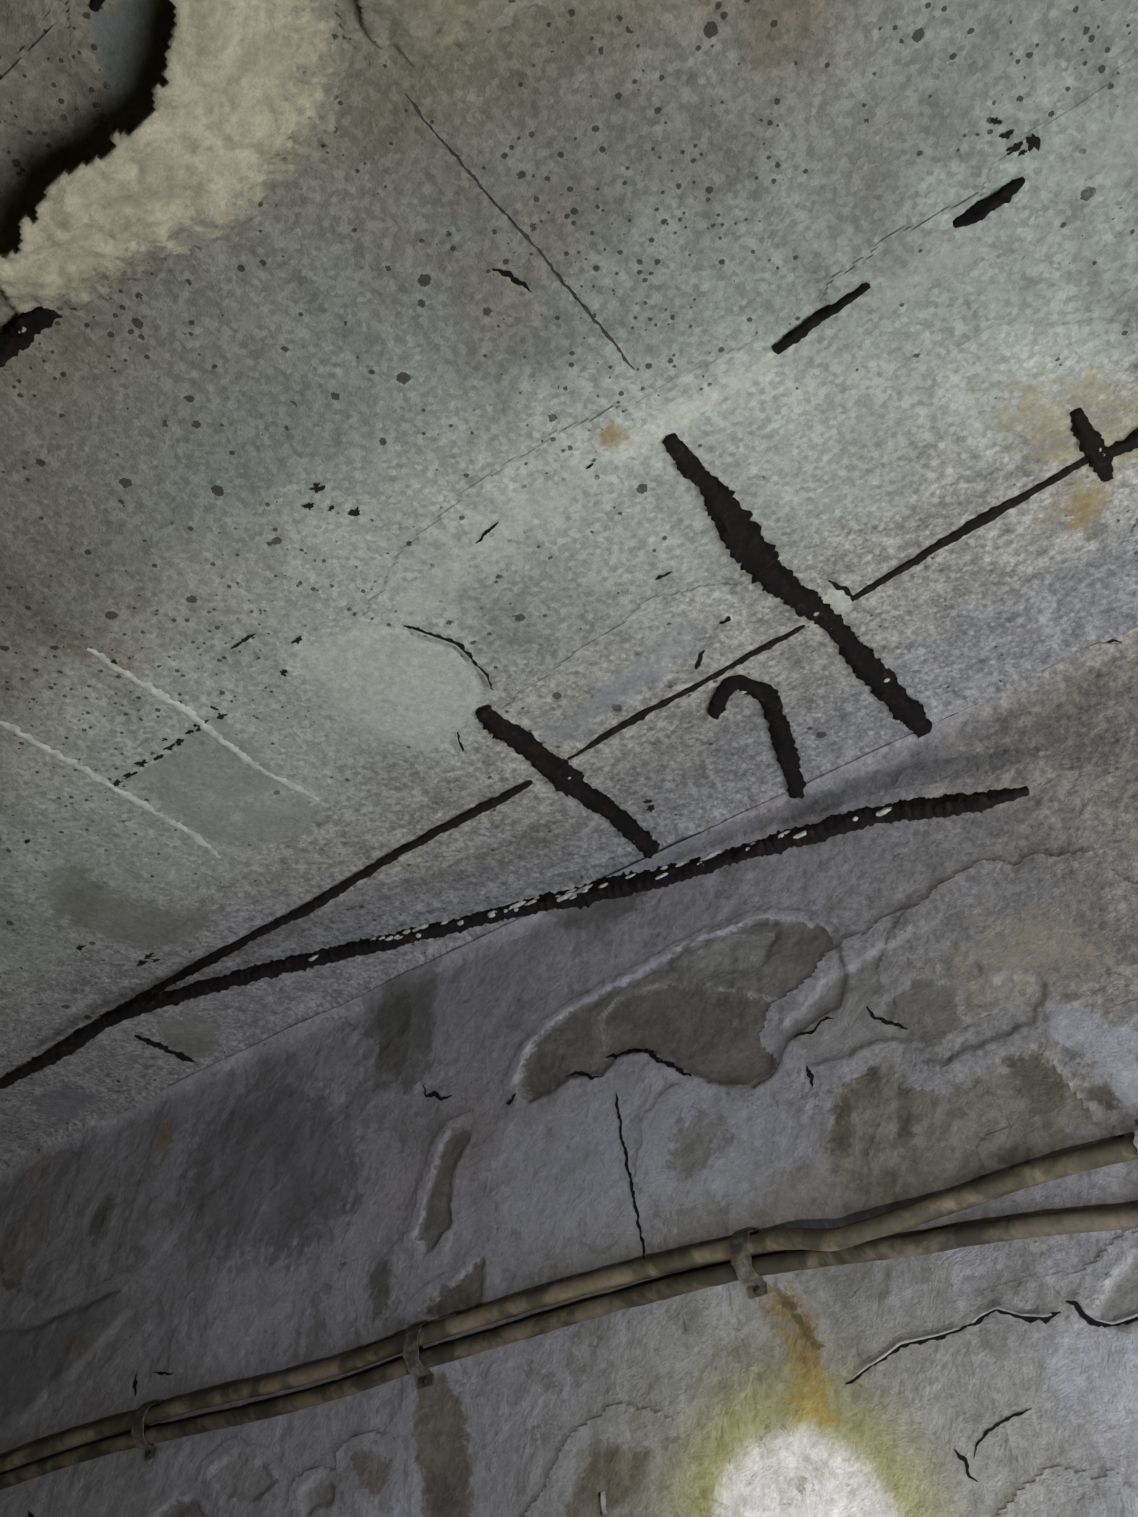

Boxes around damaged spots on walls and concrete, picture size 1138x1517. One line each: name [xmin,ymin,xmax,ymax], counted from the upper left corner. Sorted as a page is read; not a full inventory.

spalling [0,0,176,254]
spalling [0,289,16,325]
crack [828,580,854,602]
crack [695,616,731,669]
crack [134,1035,196,1063]
crack [794,1007,908,1087]
crack [423,1085,452,1101]
crack [566,1048,692,1259]
rust [729,1267,872,1470]
crack [843,1290,1138,1385]